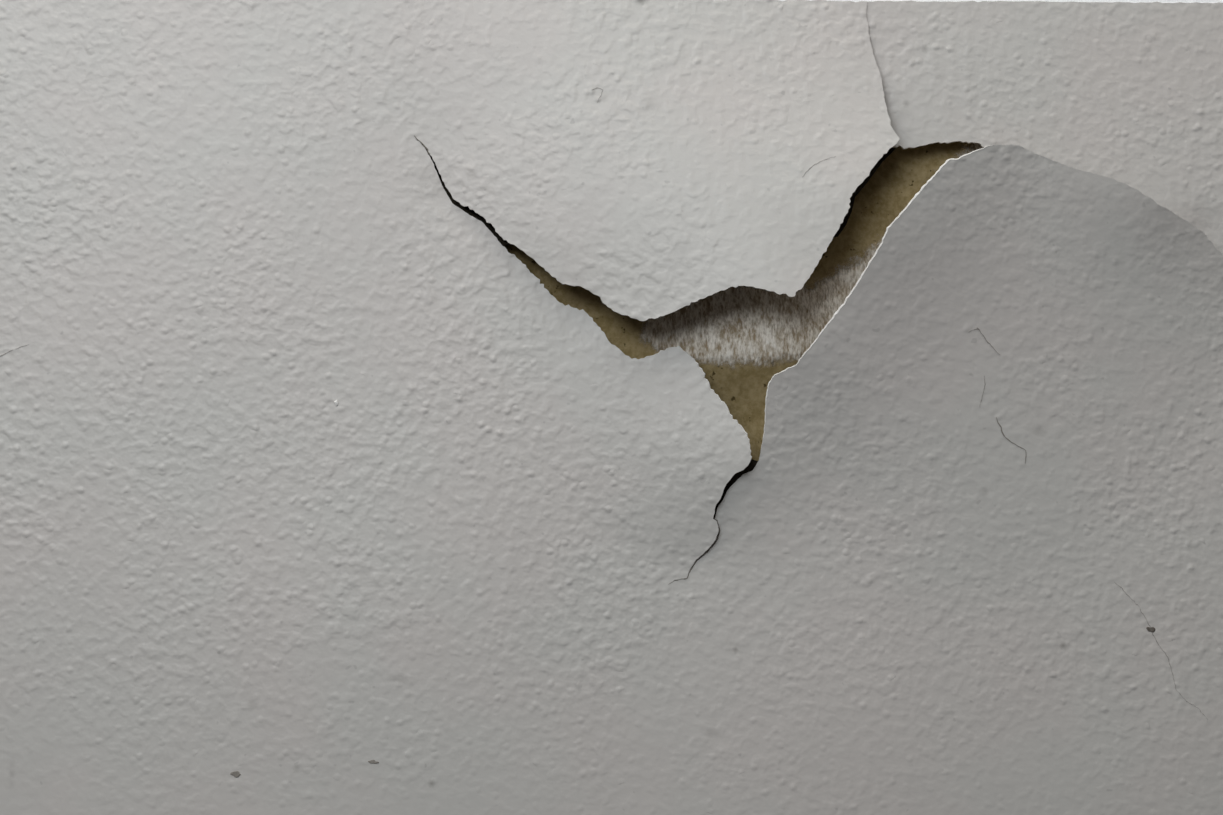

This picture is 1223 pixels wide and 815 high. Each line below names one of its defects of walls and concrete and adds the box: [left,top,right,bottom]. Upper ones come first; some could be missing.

peeling [392,0,982,585]